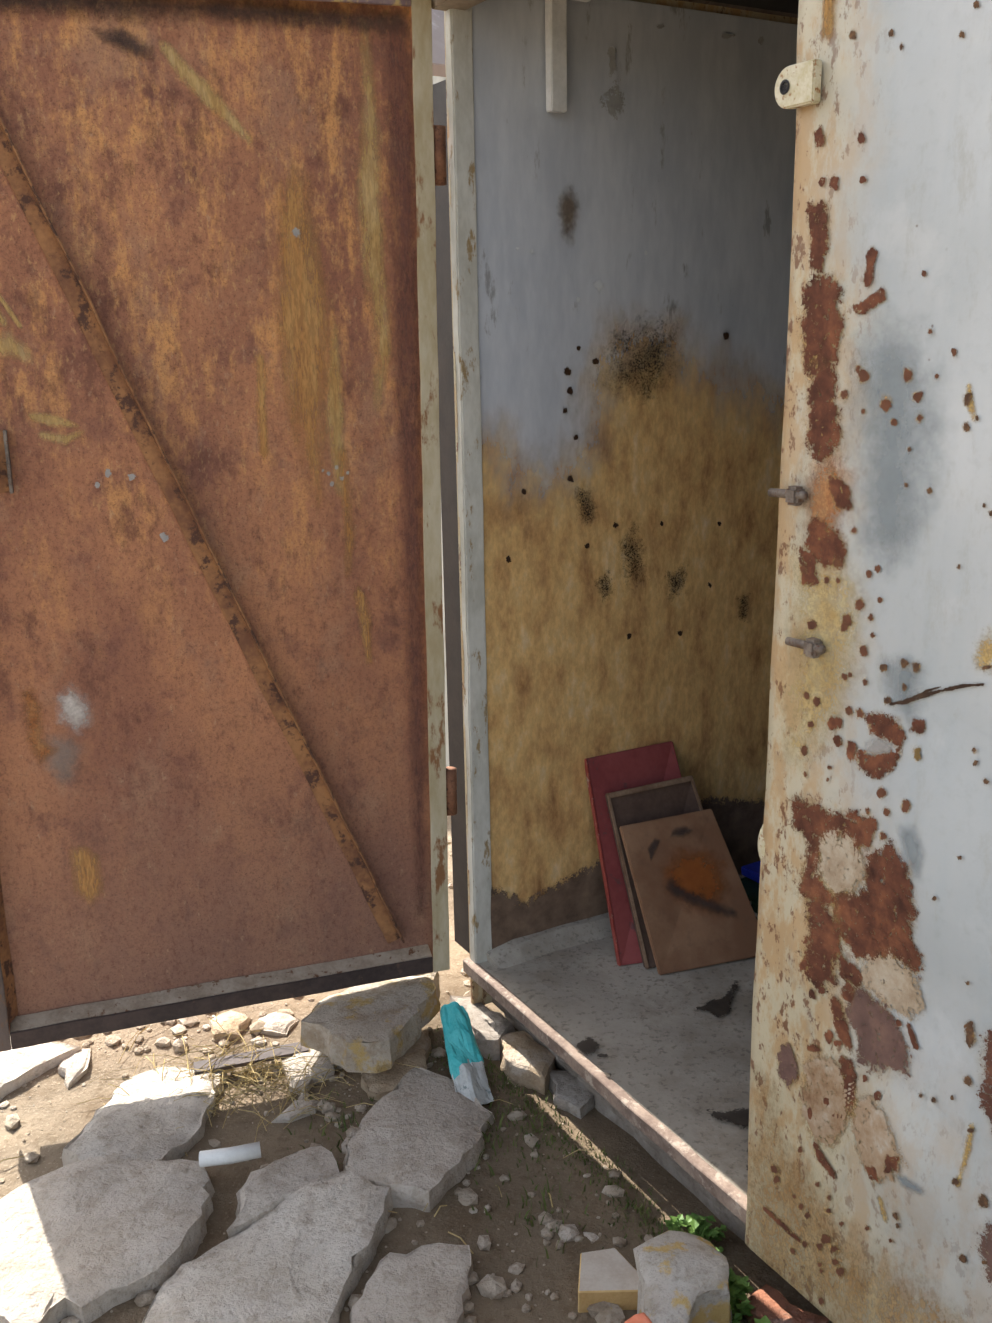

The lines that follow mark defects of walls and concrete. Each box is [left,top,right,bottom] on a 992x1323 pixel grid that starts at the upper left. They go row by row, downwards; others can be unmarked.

corrosion [814,125,825,148]
corrosion [360,28,423,877]
corrosion [789,177,926,816]
corrosion [963,384,979,432]
corrosion [482,338,784,907]
water stain [701,796,765,875]
water stain [491,857,608,949]
peeling [787,793,926,1185]
peeling [964,1019,992,1132]
corrosion [747,1054,954,1323]
corrosion [952,1124,974,1187]
peeling [959,1194,992,1287]